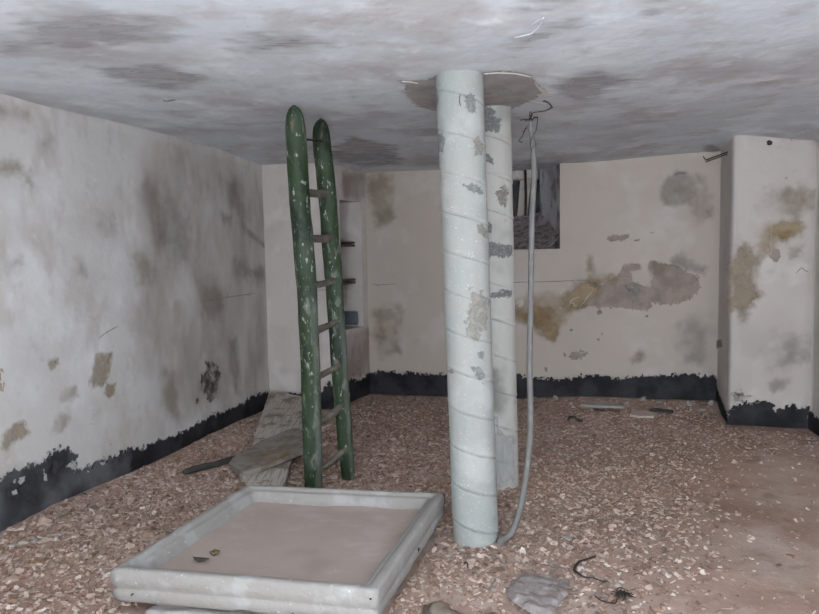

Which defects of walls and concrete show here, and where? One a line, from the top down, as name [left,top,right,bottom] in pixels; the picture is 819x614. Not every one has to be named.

spalling [477,223,512,259]
peeling [560,259,701,317]
spalling [464,287,512,341]
leakage [196,363,221,403]
spalling [471,351,484,384]
leakage [4,423,27,443]